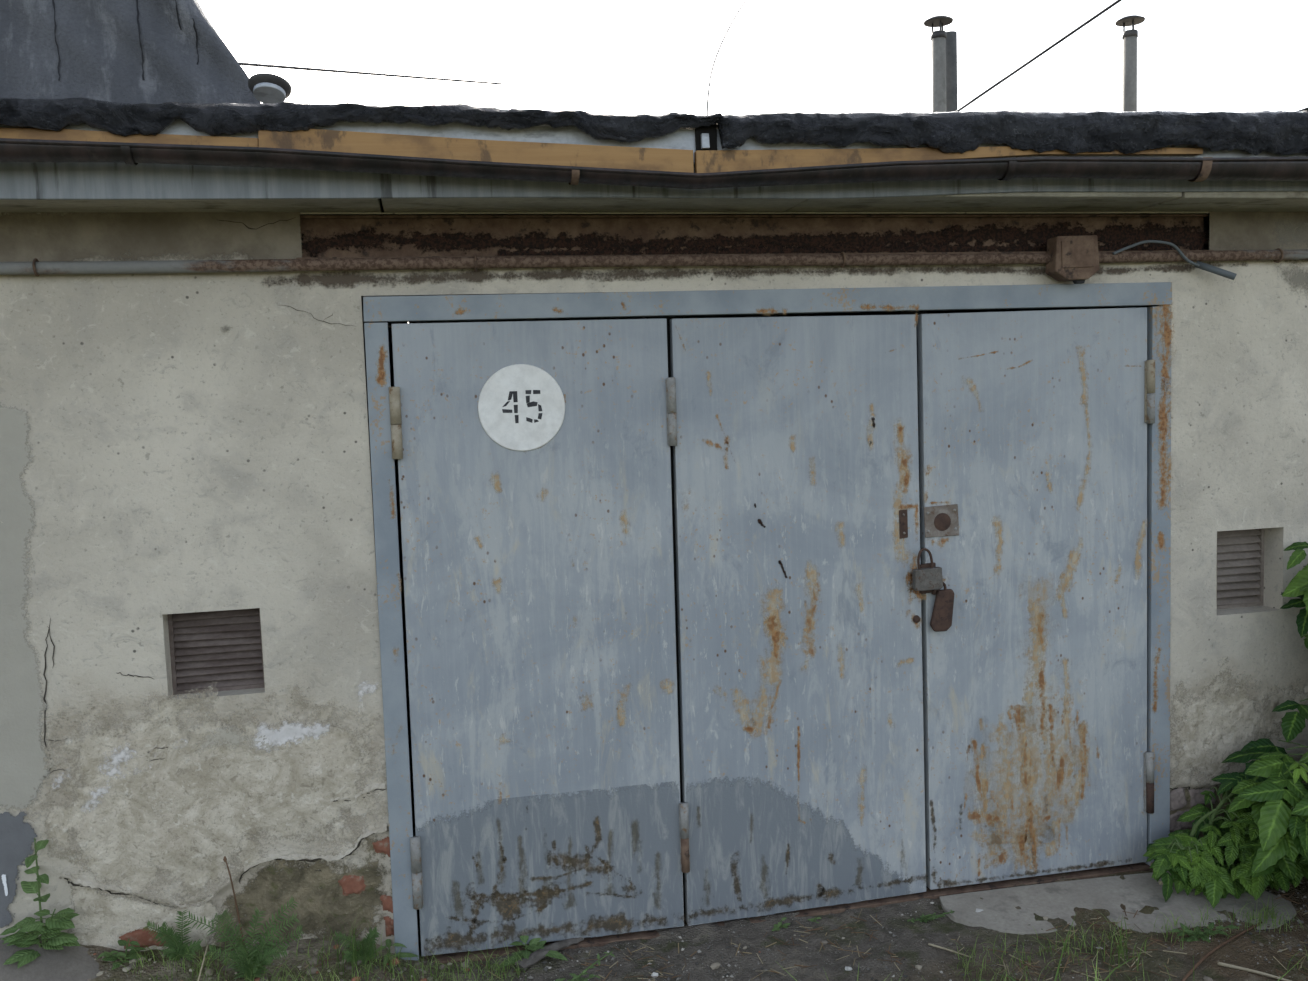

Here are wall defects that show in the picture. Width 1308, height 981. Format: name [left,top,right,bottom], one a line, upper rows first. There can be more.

rust [263,221,1247,288]
leakage [1209,212,1308,289]
rust [1155,304,1173,507]
rust [894,424,948,600]
crack [31,618,67,801]
crack [64,878,174,907]
flaking render [28,686,394,951]
crack [239,830,389,884]
leakage [416,776,910,960]
rust [725,560,788,733]
rust [804,567,820,668]
rust [690,603,1132,919]